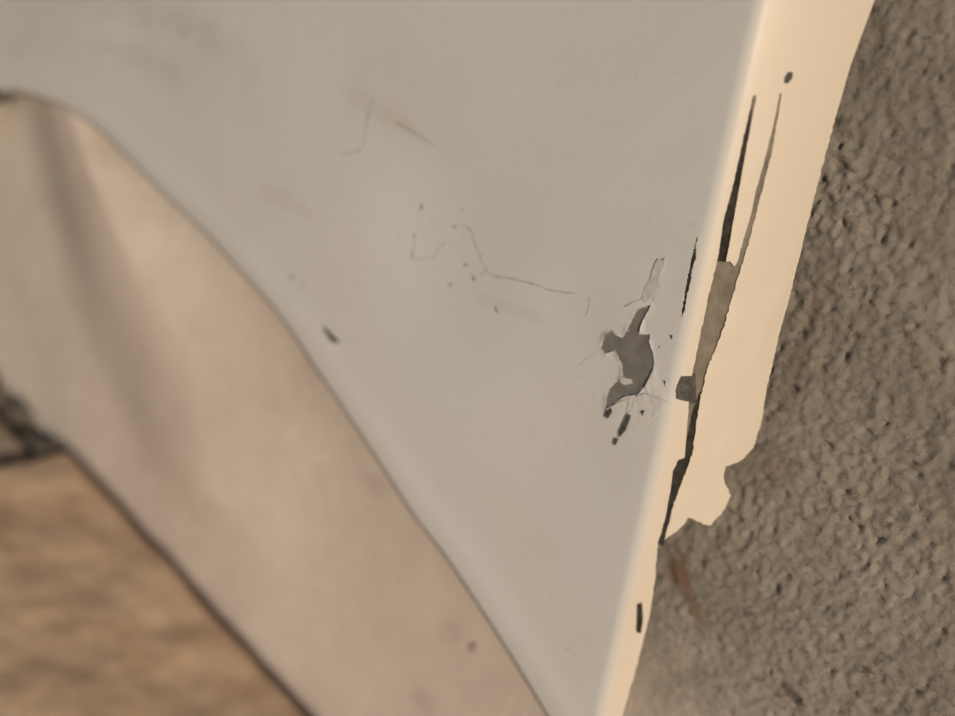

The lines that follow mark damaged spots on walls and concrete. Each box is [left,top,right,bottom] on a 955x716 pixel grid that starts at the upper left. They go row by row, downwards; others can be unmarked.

peeling [601,72,838,549]